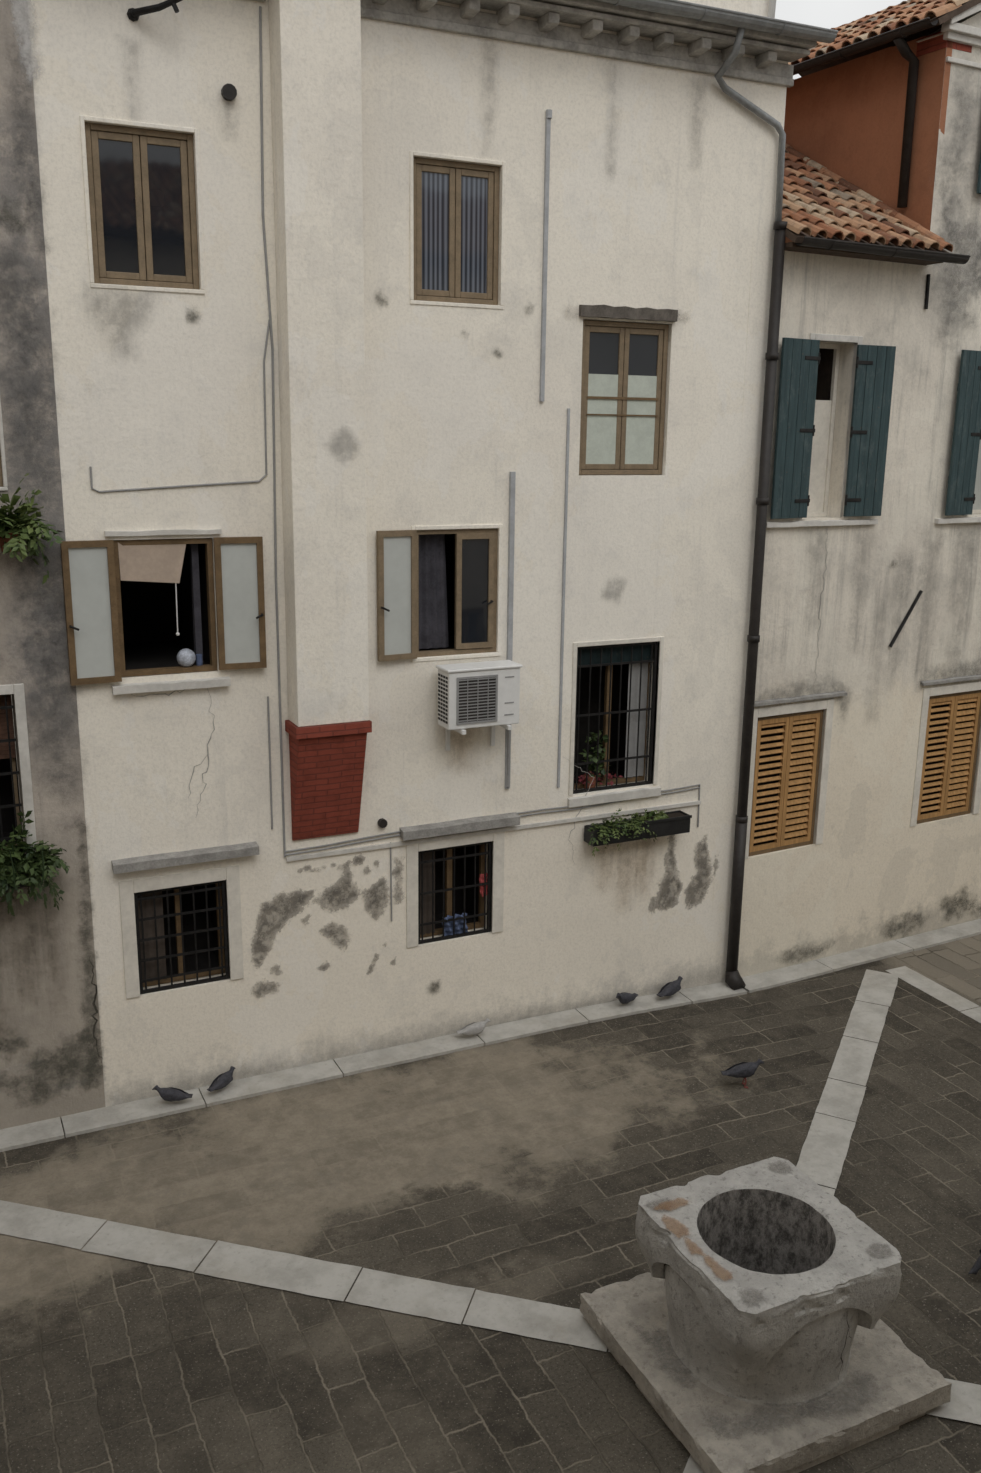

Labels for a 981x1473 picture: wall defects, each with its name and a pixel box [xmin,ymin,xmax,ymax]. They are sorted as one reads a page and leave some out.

crack [131,688,215,816]
flaking render [252,854,390,997]
flaking render [649,835,718,911]
leakage [0,1034,95,1100]